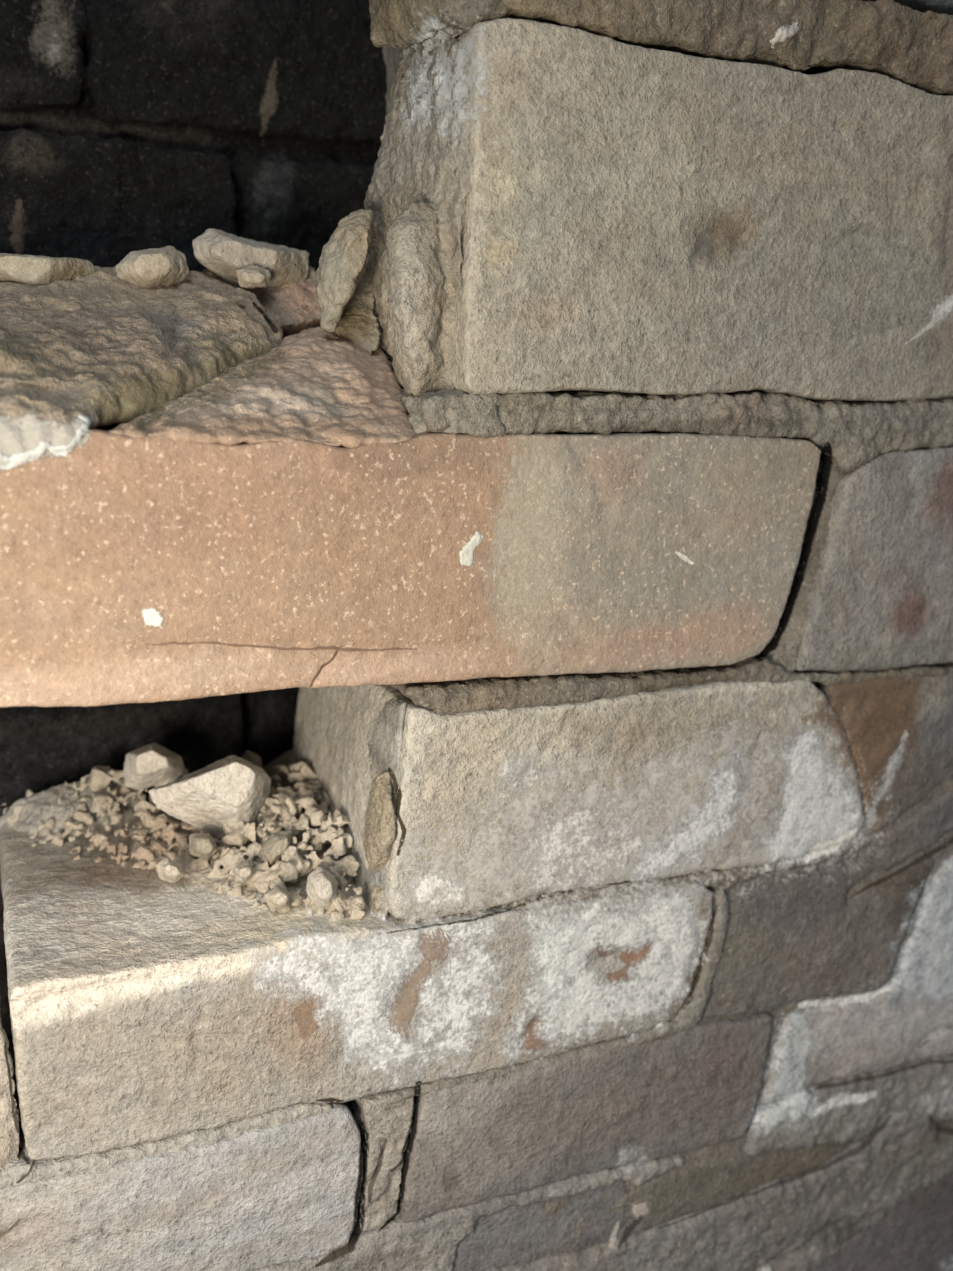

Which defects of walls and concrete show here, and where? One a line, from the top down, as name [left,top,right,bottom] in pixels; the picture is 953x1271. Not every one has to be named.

spalling [0,209,416,471]
crack [756,443,832,661]
leakage [238,696,908,1084]
leakage [748,856,953,1135]
crack [315,1081,421,1267]